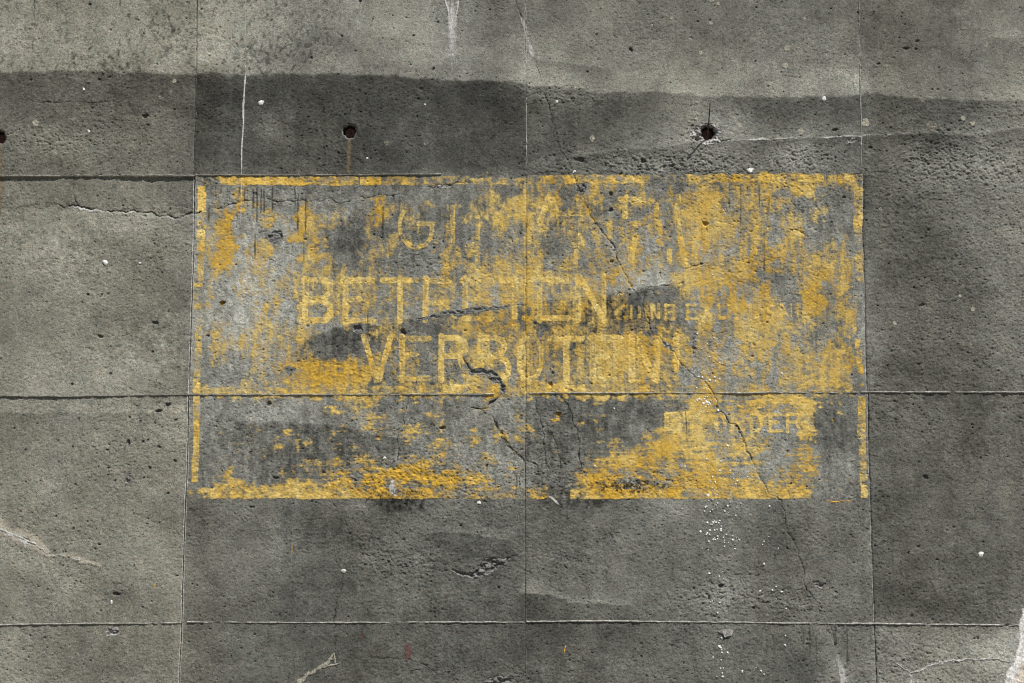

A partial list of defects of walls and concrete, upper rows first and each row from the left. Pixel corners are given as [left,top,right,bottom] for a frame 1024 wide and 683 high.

crack [27,194,398,221]
spalling [265,230,283,243]
spalling [416,306,509,320]
crack [513,2,899,598]
spalling [469,368,506,394]
crack [471,395,583,505]
spalling [452,557,510,579]